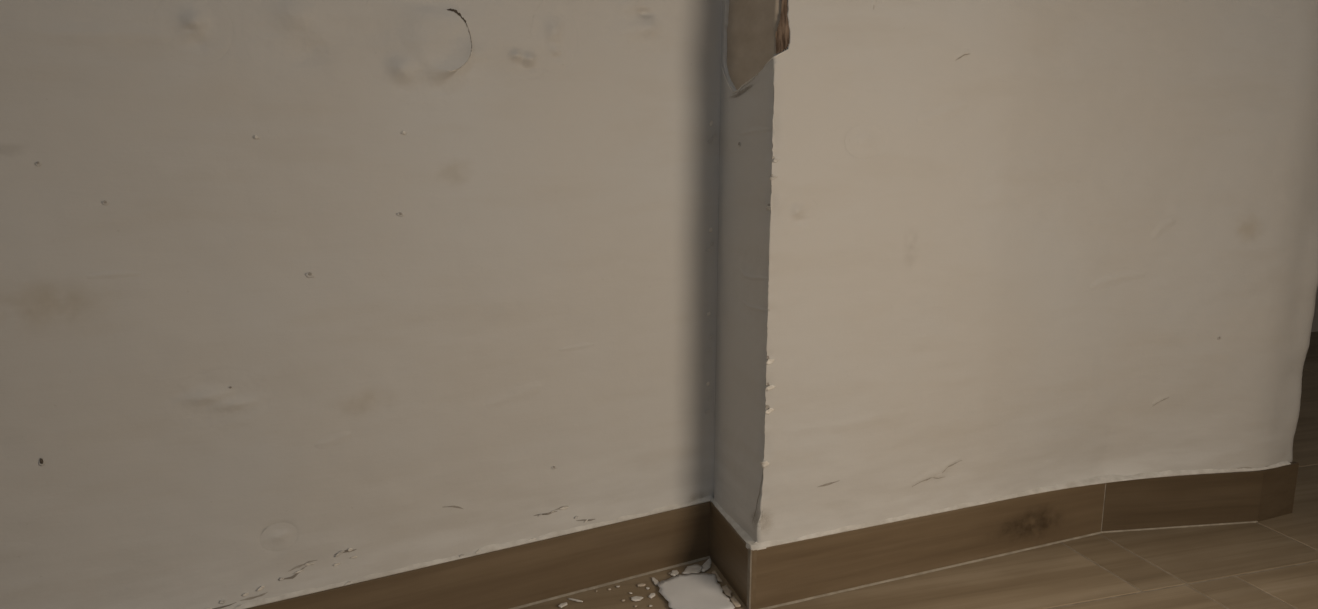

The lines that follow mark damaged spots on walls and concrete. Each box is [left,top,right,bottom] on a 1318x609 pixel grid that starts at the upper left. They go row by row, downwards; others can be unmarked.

peeling [721,0,796,98]